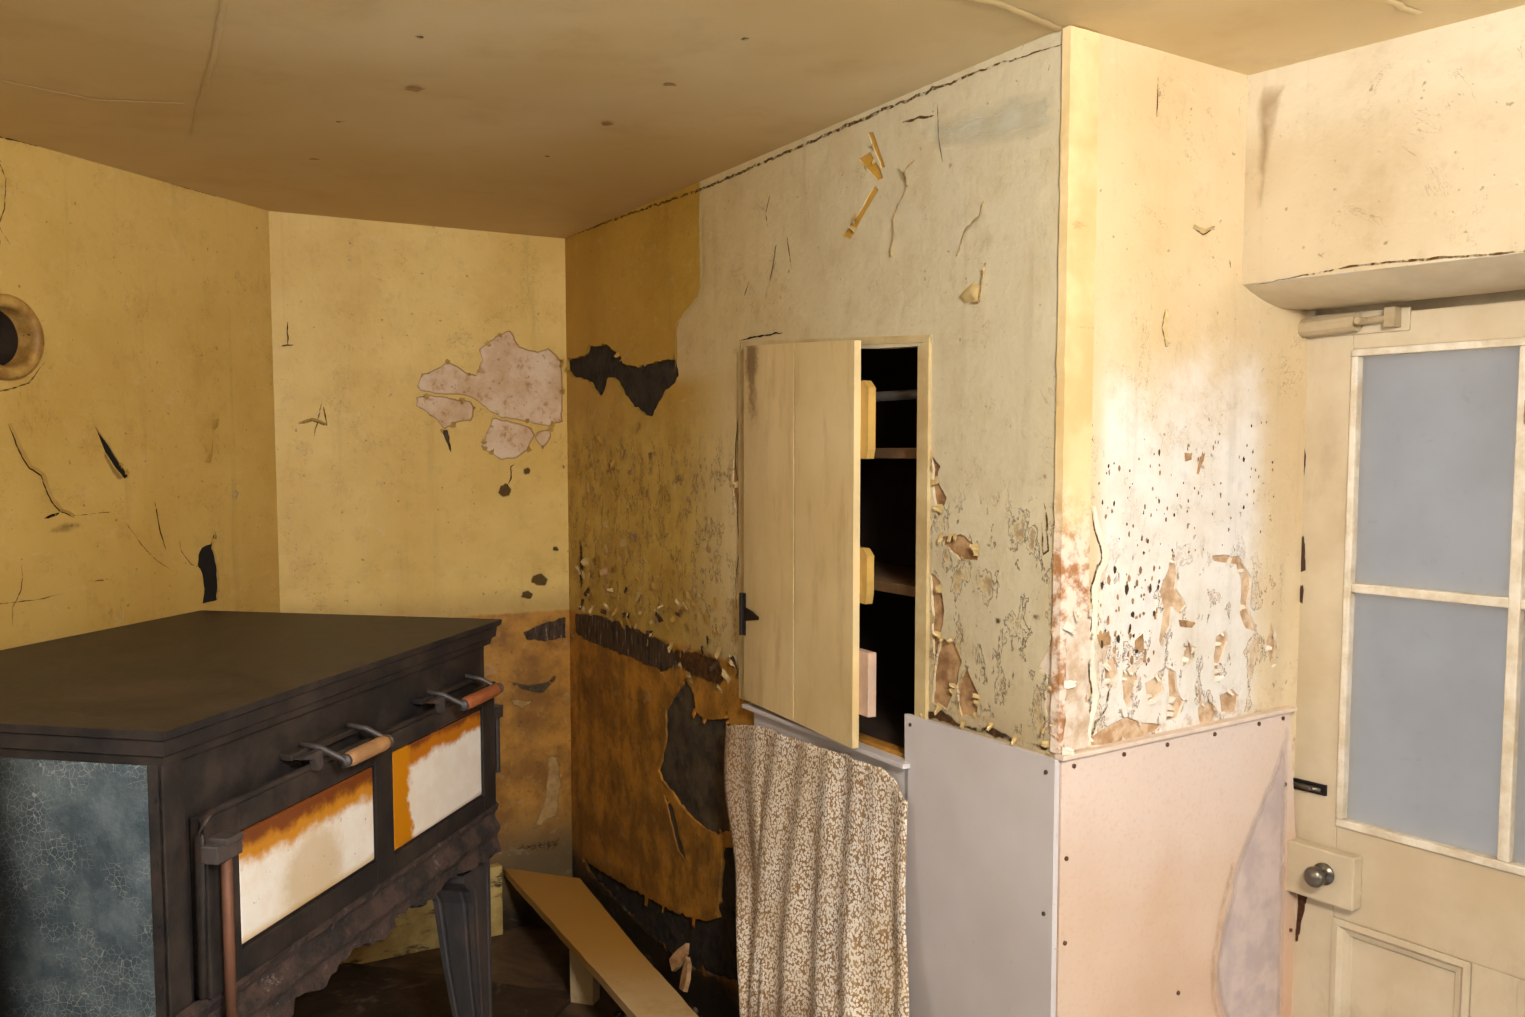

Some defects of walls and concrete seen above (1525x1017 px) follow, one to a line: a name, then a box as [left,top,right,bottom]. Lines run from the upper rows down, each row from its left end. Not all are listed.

crack [578,0,1063,296]
crack [740,332,783,349]
crack [0,565,50,626]
crack [0,362,197,568]
flaking render [416,331,739,980]
crack [733,423,741,608]
flaking render [929,450,980,562]
flaking render [930,574,981,720]
peeling [1039,421,1279,755]
leakage [1219,755,1284,1017]